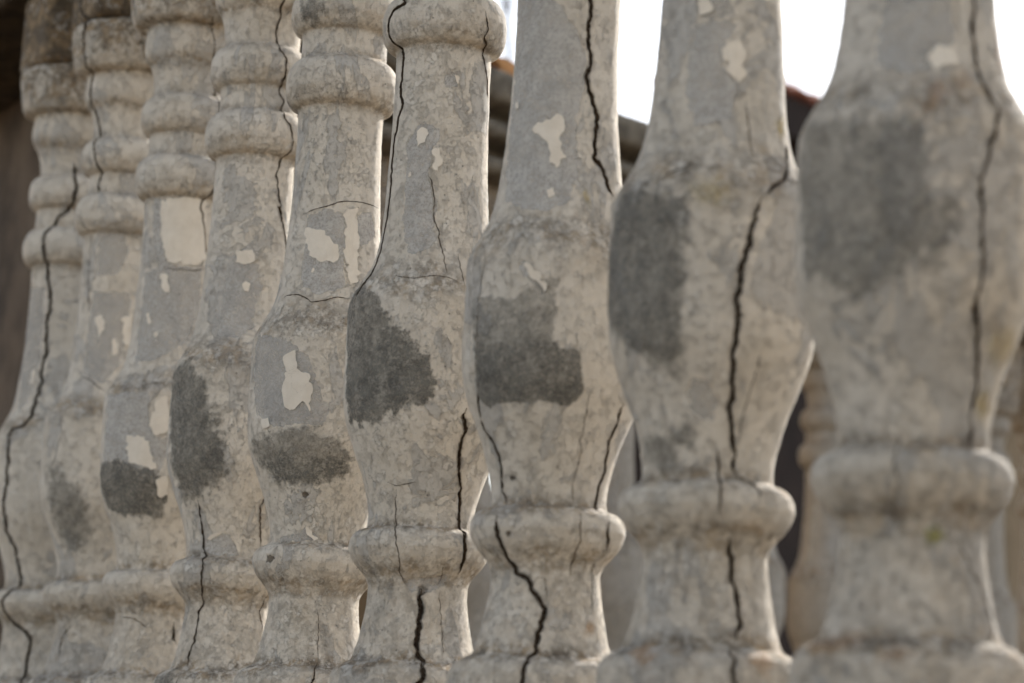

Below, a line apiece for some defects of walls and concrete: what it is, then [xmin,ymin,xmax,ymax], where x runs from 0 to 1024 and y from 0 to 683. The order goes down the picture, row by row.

peeling [505,0,586,210]
crack [585,0,614,197]
crack [1,0,103,683]
peeling [254,335,329,429]
damp [259,446,350,485]
peeling [301,207,375,294]
damp [345,287,437,428]
crack [275,0,547,683]
damp [475,328,584,409]
damp [608,190,686,366]
crack [716,146,789,513]
crack [727,538,742,683]